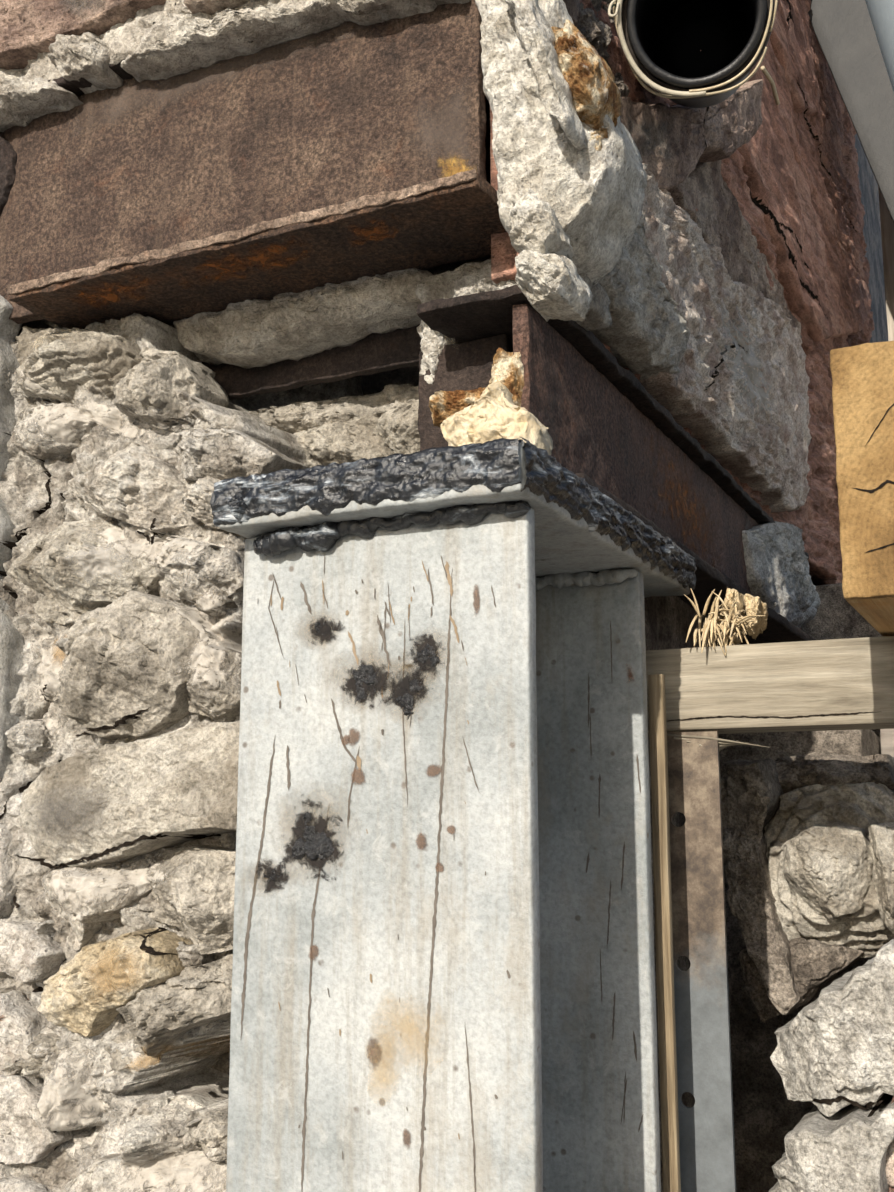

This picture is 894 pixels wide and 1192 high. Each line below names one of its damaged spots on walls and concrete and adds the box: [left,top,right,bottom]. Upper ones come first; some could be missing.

crack [0,459,66,613]
crack [75,707,151,736]
crack [17,833,221,872]